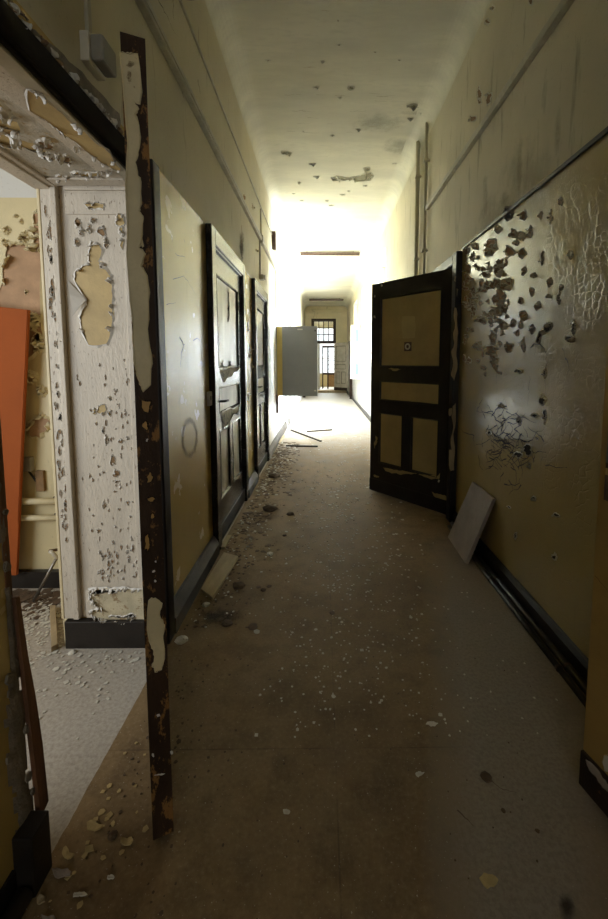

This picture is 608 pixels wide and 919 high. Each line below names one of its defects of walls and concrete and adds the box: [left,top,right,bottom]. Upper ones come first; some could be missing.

peeling [0,89,122,183]
peeling [309,163,374,196]
peeling [0,205,69,543]
peeling [68,201,126,348]
peeling [453,196,564,376]
peeling [516,393,547,425]
peeling [565,319,577,343]
flaking render [3,587,35,833]